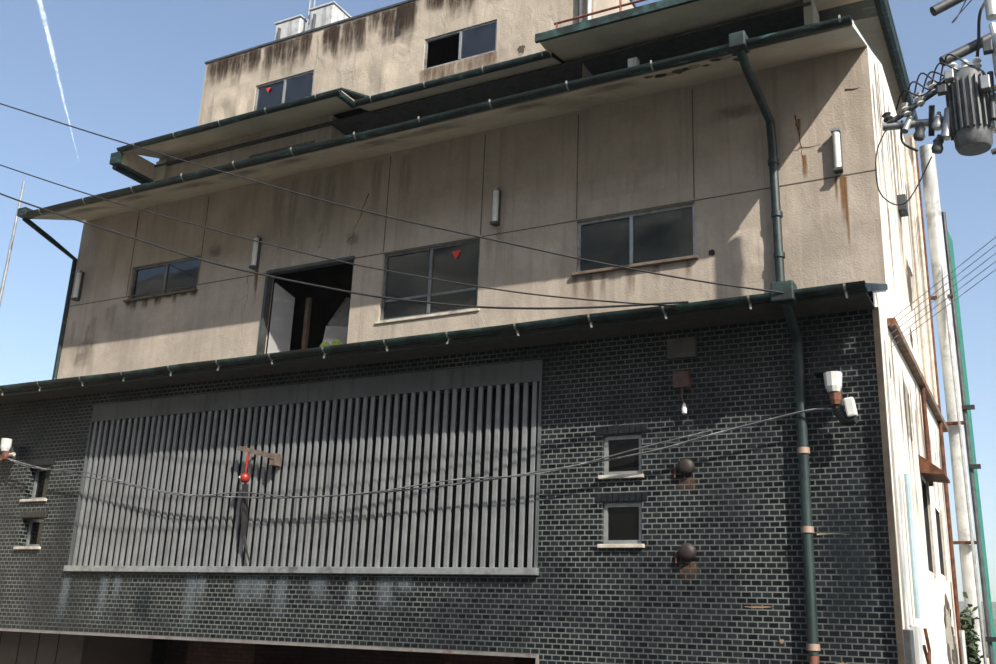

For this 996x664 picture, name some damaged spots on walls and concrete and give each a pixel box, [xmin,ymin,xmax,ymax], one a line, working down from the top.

water stain [427,0,473,8]
water stain [207,2,417,76]
rust [835,176,849,227]